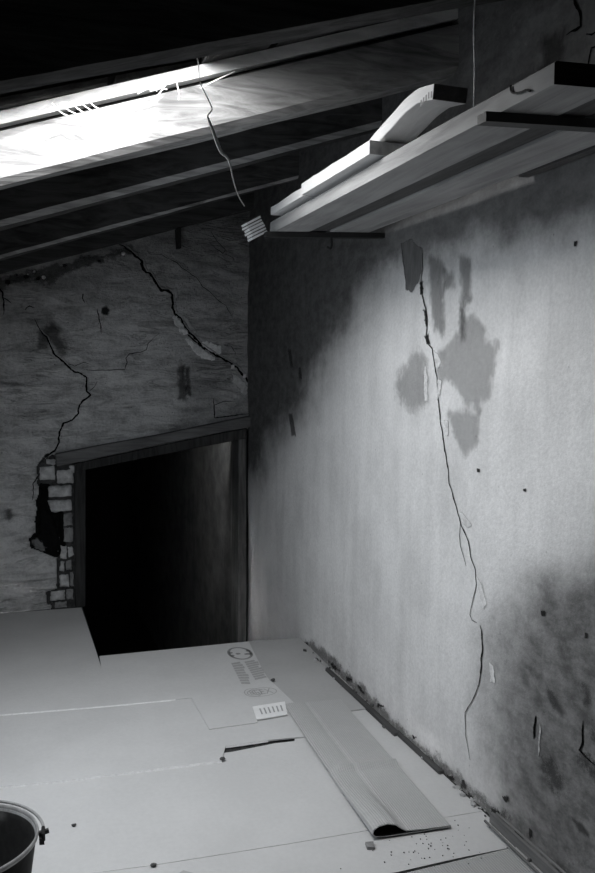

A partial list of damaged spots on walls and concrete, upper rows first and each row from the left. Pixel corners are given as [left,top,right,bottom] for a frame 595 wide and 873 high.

crack [566,0,595,64]
peeling [401,239,423,292]
crack [0,243,248,500]
spalling [29,453,77,609]
crack [419,247,495,758]